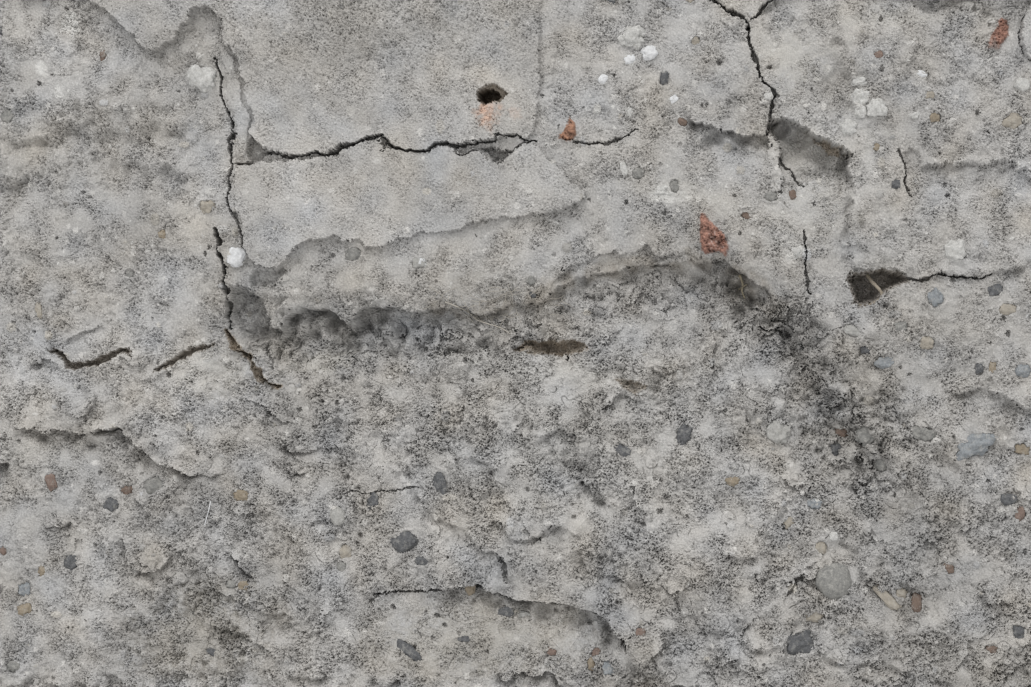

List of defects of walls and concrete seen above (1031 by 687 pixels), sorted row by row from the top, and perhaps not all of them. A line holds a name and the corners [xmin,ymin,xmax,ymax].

crack [710,0,778,136]
crack [267,133,538,159]
spalling [0,0,1031,349]
crack [573,128,639,148]
crack [779,157,805,188]
crack [897,148,914,198]
crack [46,58,282,390]
crack [803,231,812,296]
crack [905,272,993,283]
crack [0,462,13,473]
crack [15,425,223,481]
crack [368,584,627,657]